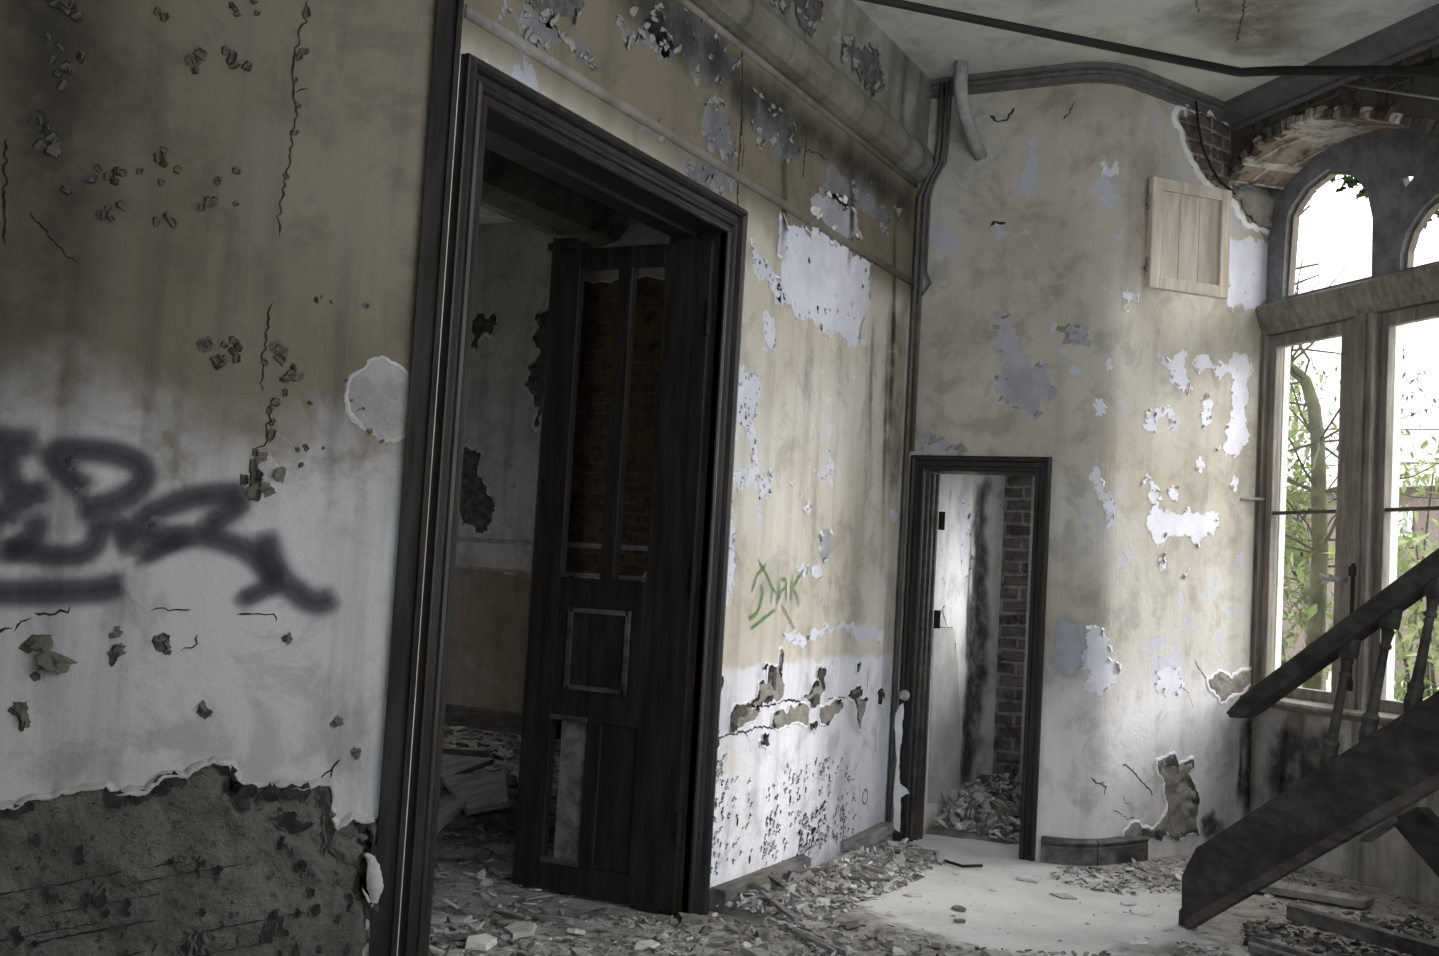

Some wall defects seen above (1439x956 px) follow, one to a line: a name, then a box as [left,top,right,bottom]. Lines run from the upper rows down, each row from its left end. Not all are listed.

crack [1235,0,1246,43]
crack [276,0,312,236]
peeling [750,163,902,351]
crack [251,303,288,455]
flaking render [459,443,498,536]
peeling [1160,349,1255,492]
flaking render [0,756,378,956]
crack [718,676,869,739]
flaking render [711,620,909,875]
water stain [960,484,990,784]
peeling [1081,625,1122,698]
flaking render [1121,751,1201,843]